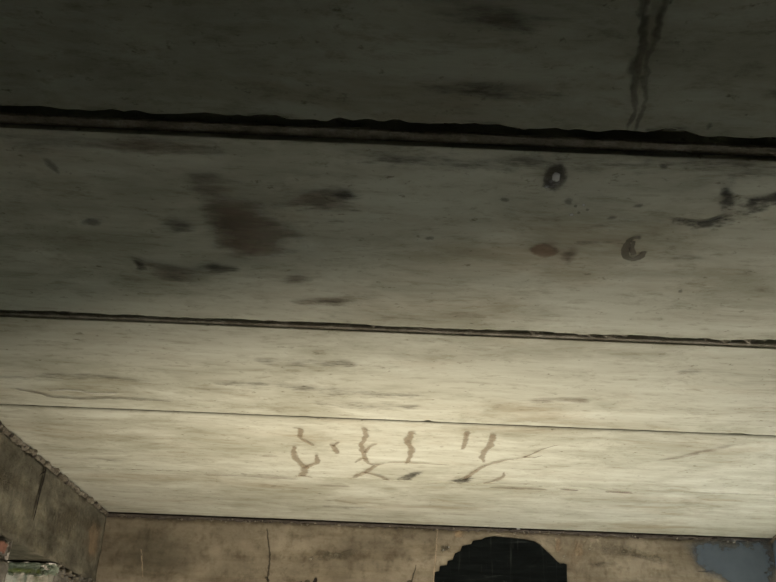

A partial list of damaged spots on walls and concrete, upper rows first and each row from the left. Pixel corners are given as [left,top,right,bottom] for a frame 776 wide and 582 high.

leakage [744,194,776,213]
leakage [677,217,729,228]
crack [33,468,46,521]